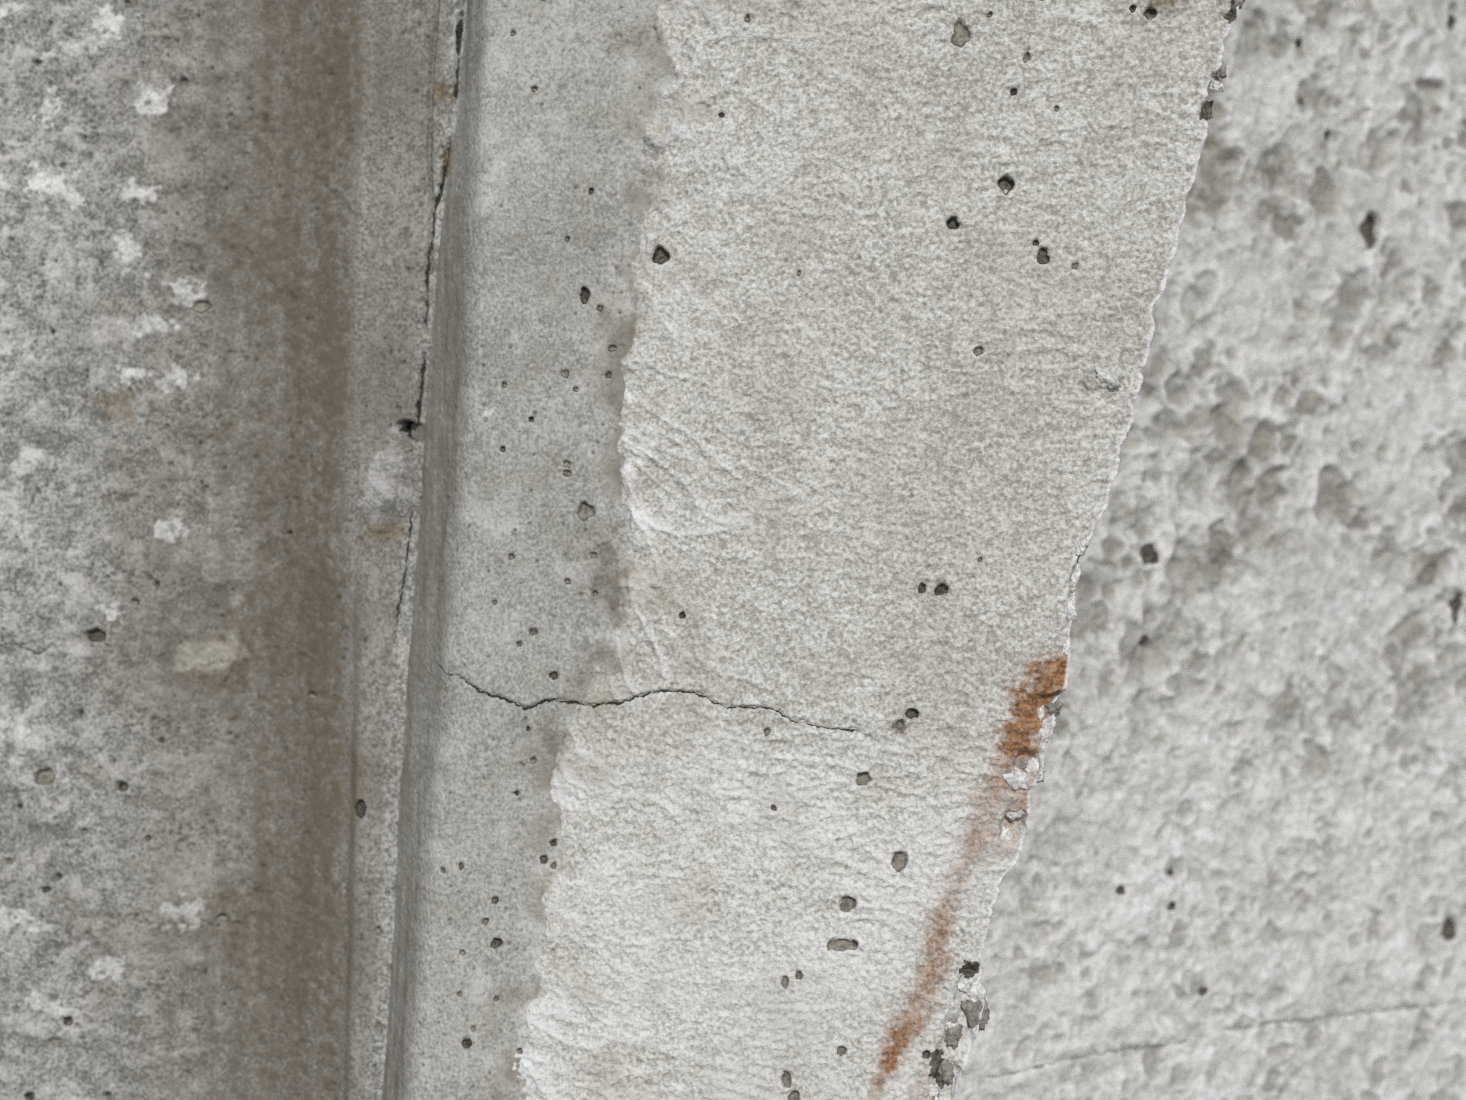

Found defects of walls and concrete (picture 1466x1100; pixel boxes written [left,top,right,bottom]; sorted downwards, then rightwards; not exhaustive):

spalling [1224,0,1245,23]
spalling [1200,60,1227,120]
crack [416,0,464,425]
crack [394,510,413,635]
spalling [1062,537,1089,656]
crack [438,663,870,738]
spalling [1002,697,1063,791]
corrosion [862,644,1070,1100]
spalling [1001,810,1025,839]
spalling [922,960,990,1100]